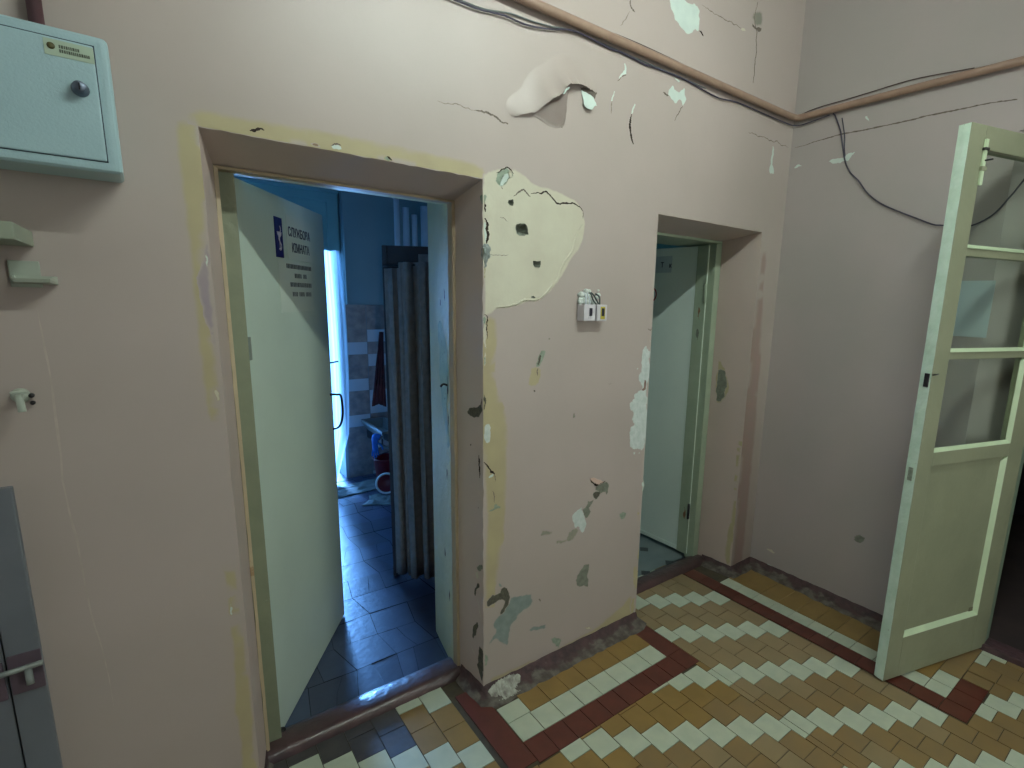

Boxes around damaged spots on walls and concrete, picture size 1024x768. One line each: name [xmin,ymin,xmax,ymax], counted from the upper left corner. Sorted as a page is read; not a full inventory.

peeling [670,0,703,36]
peeling [663,76,686,119]
peeling [174,107,644,686]
flaking render [715,360,730,403]